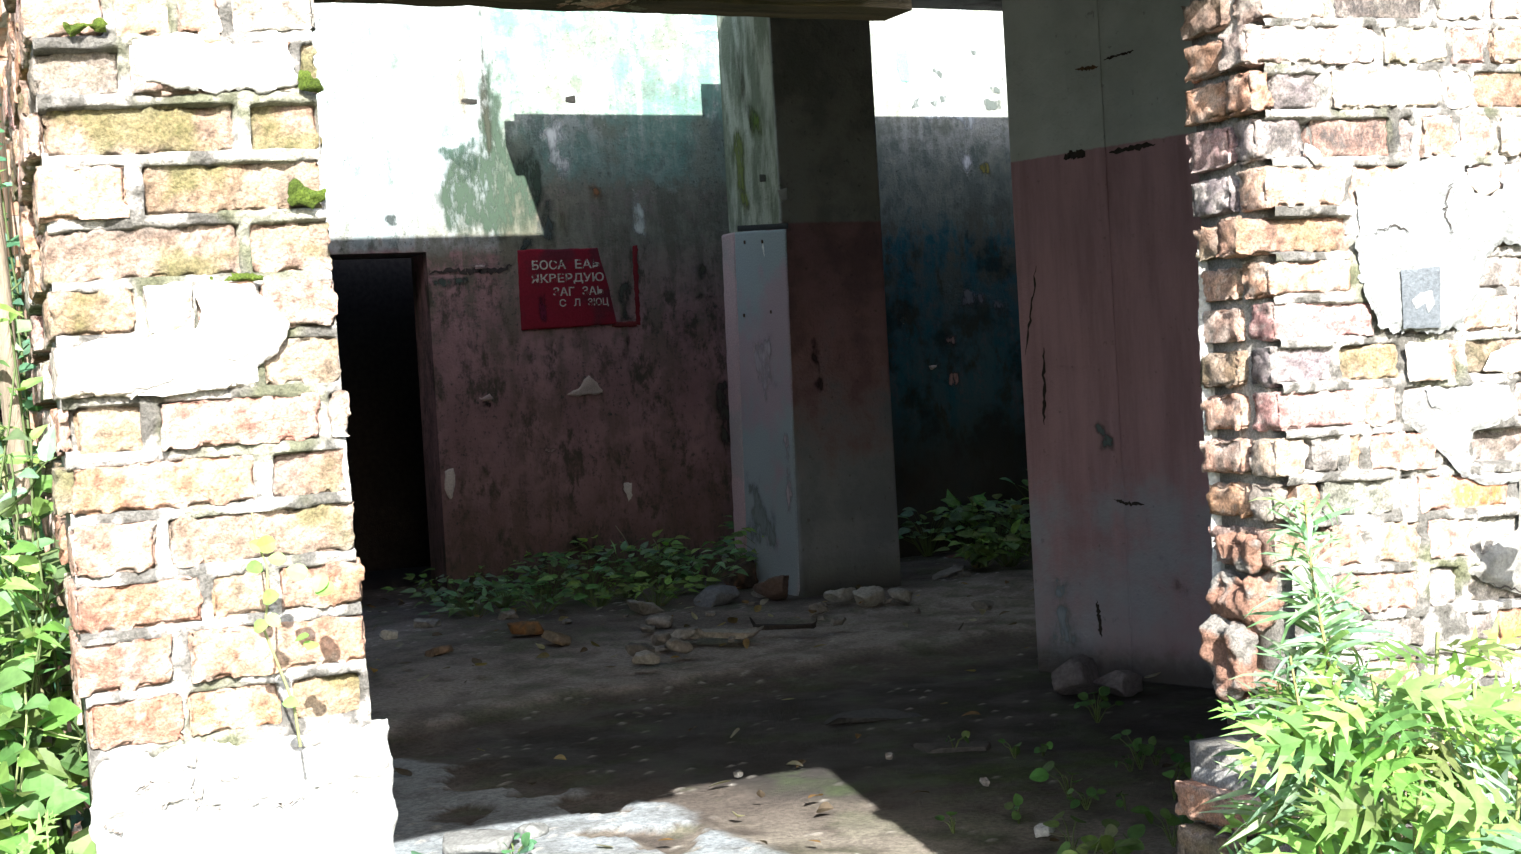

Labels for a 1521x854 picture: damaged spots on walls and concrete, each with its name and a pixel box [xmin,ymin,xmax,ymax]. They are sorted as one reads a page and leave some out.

damp [438,49,542,237]
peeling [545,122,569,171]
flaking render [1467,168,1500,195]
peeling [143,281,256,334]
peeling [1412,290,1435,313]
crack [1025,269,1046,425]
peeling [137,368,258,397]